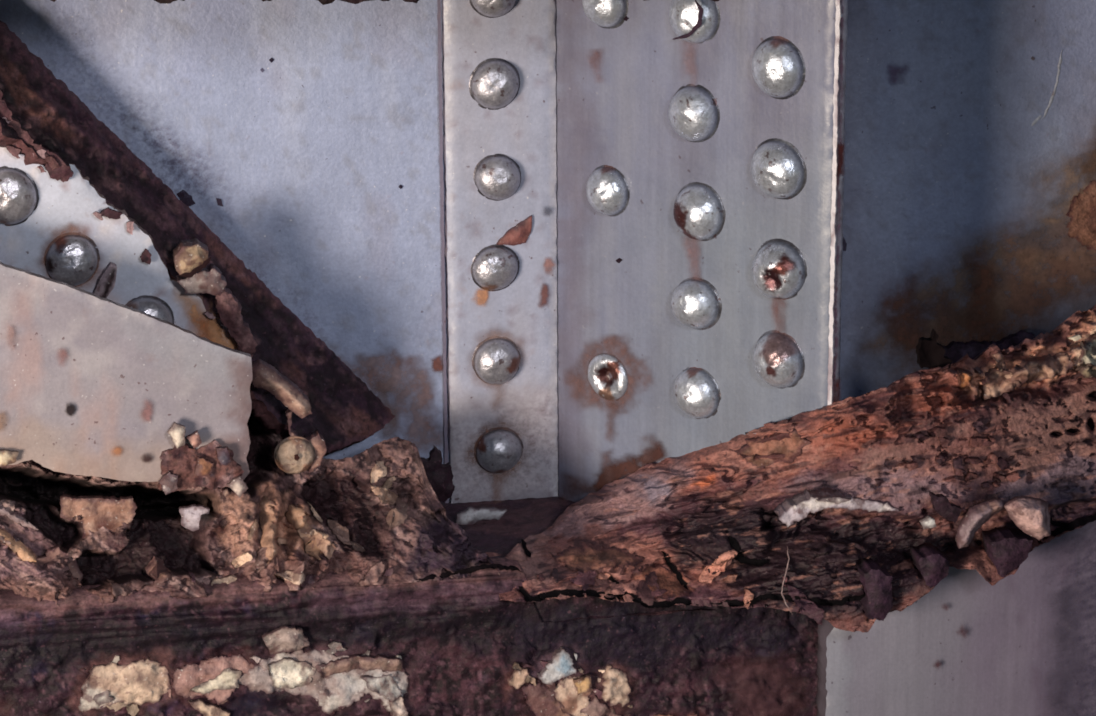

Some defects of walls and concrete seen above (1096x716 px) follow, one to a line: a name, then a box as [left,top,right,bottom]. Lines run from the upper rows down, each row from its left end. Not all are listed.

rust [0,88,74,182]
rust [861,149,1096,400]
rust [173,238,327,473]
rust [142,422,248,498]
peeling [0,499,39,562]
peeling [179,504,210,531]
peeling [211,495,365,595]
crack [416,536,865,608]
peeling [774,487,900,528]
rust [929,491,1051,578]
peeling [70,625,412,716]
rust [521,664,633,716]